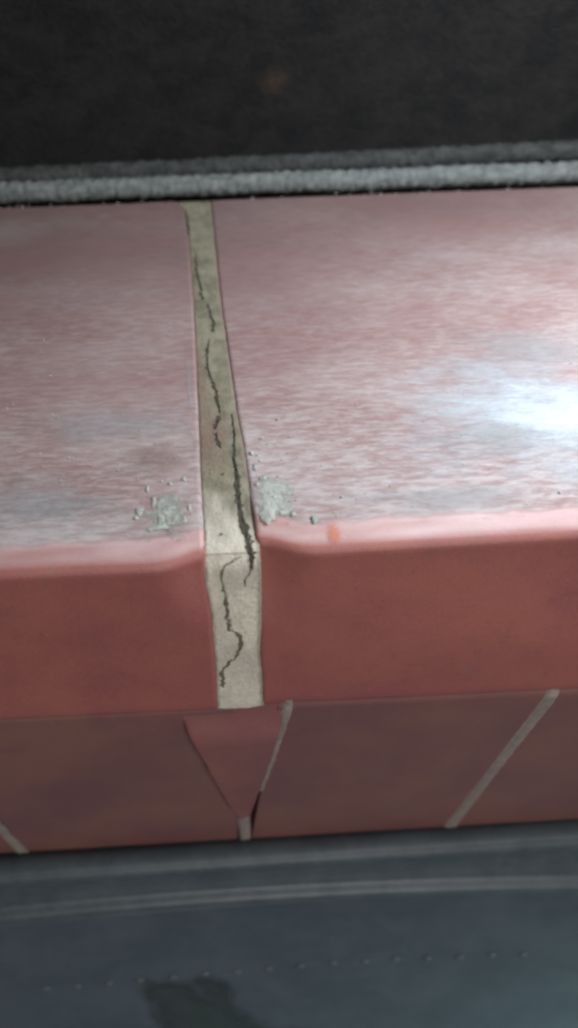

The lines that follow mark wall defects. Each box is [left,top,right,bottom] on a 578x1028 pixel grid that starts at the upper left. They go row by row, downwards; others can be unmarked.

crack [185,212,256,687]